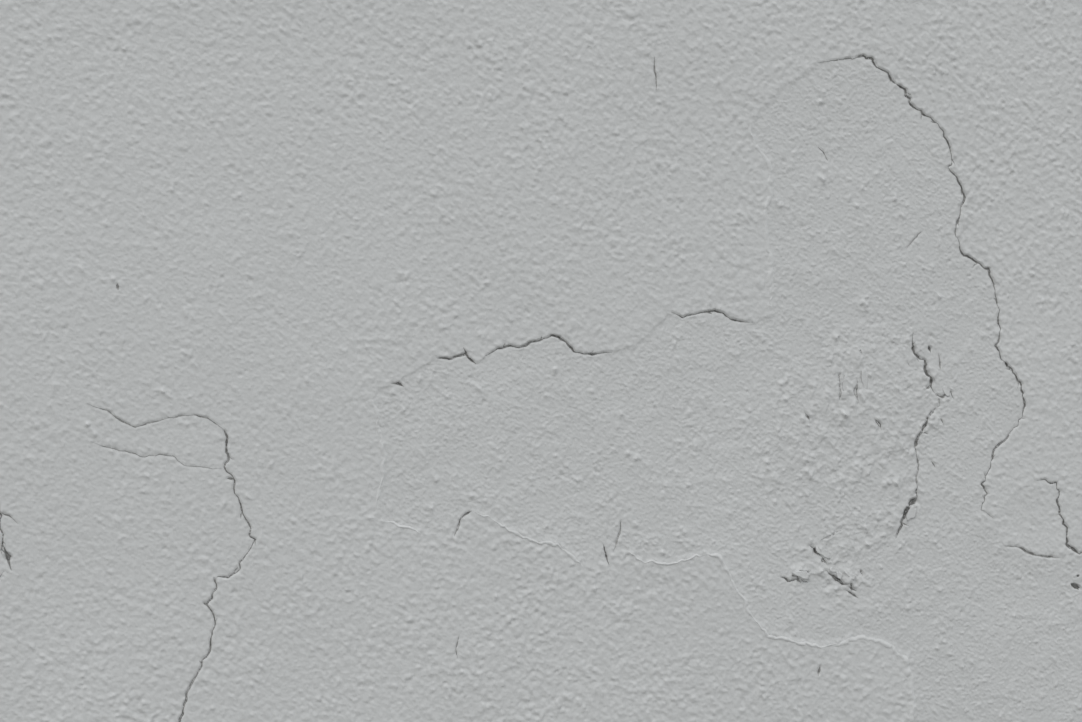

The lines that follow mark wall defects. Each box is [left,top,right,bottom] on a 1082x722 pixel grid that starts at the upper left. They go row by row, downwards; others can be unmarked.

crack [439,334,606,364]
crack [672,310,744,322]
crack [825,55,1026,535]
crack [0,513,16,577]
crack [91,405,256,722]
crack [1008,479,1082,558]